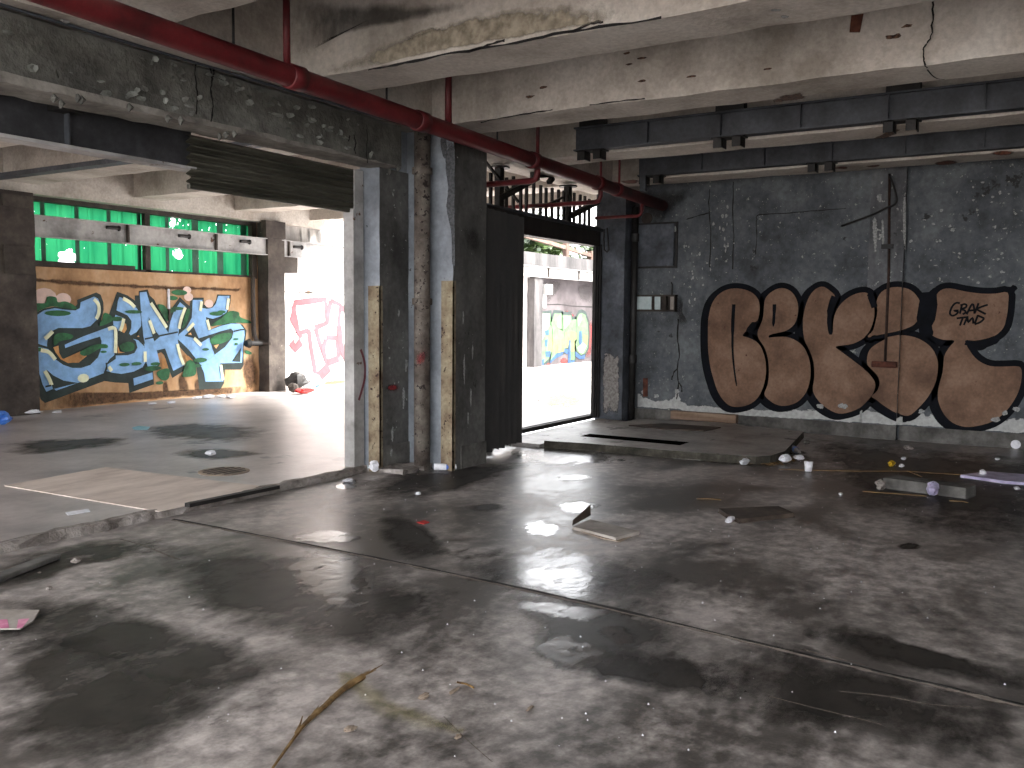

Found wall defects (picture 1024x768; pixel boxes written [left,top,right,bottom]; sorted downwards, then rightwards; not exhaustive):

water stain [321,7,430,40]
peeling [357,7,598,64]
crack [368,16,661,71]
crack [922,1,945,80]
crack [194,64,215,122]
water stain [20,438,118,453]
water stain [149,424,257,459]
peeling [603,353,619,414]
crack [671,319,683,399]
peeling [638,389,942,427]
peeling [986,407,1024,433]
water stain [2,602,264,748]